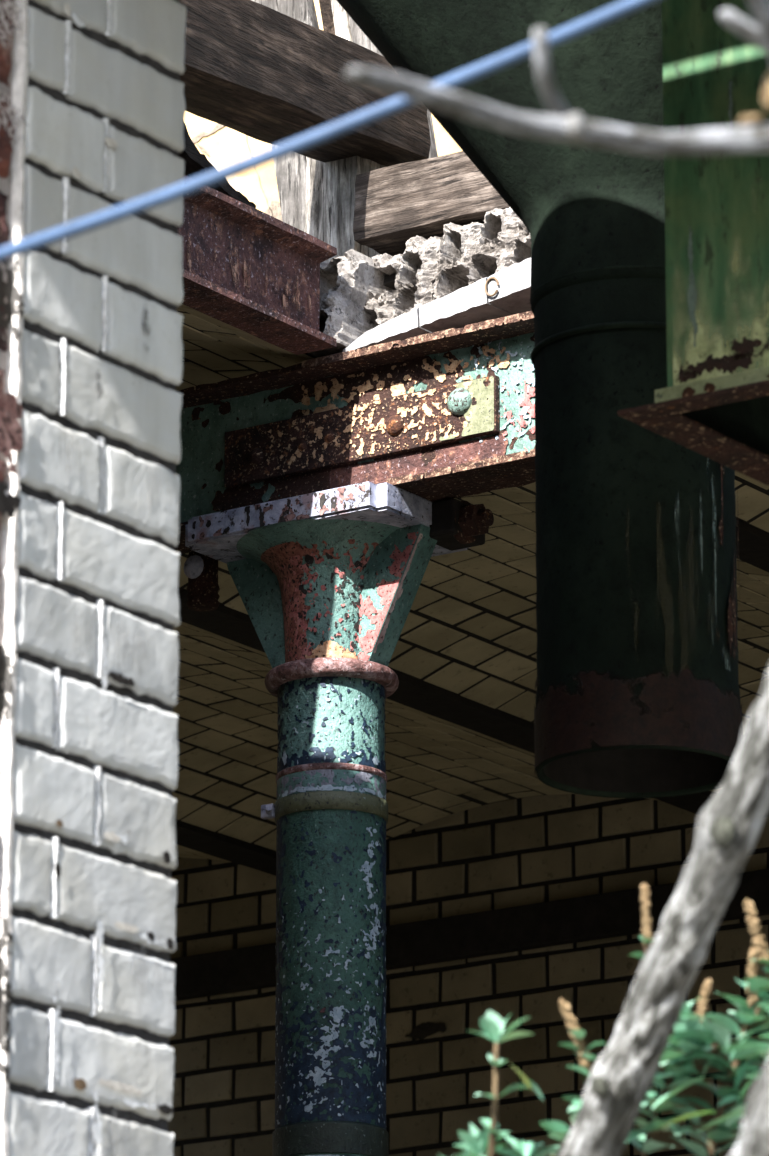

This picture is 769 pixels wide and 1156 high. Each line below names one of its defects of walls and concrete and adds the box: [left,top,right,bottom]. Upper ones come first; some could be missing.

rust [215,253,250,291]
rust [283,282,311,309]
rust [263,344,495,418]
peeling [255,484,365,525]
rust [192,429,535,539]
peeling [261,532,423,663]
peeling [276,676,386,800]
rust [534,668,742,774]
peeling [275,811,387,1129]